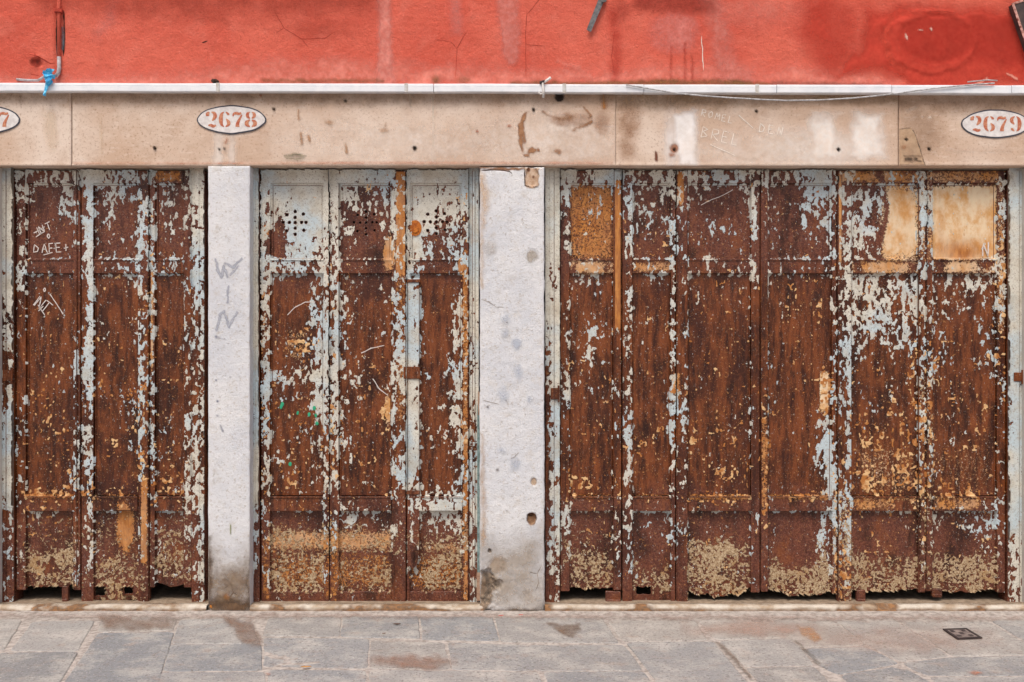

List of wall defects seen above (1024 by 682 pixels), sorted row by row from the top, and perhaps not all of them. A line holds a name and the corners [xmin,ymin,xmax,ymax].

corrosion [16,241,188,565]
peeling [2,167,204,602]
corrosion [250,162,450,611]
corrosion [409,193,468,600]
corrosion [562,401,621,552]
corrosion [568,180,673,332]
peeling [253,112,1022,610]
corrosion [620,413,667,474]
corrosion [635,328,753,402]
corrosion [678,171,1006,611]